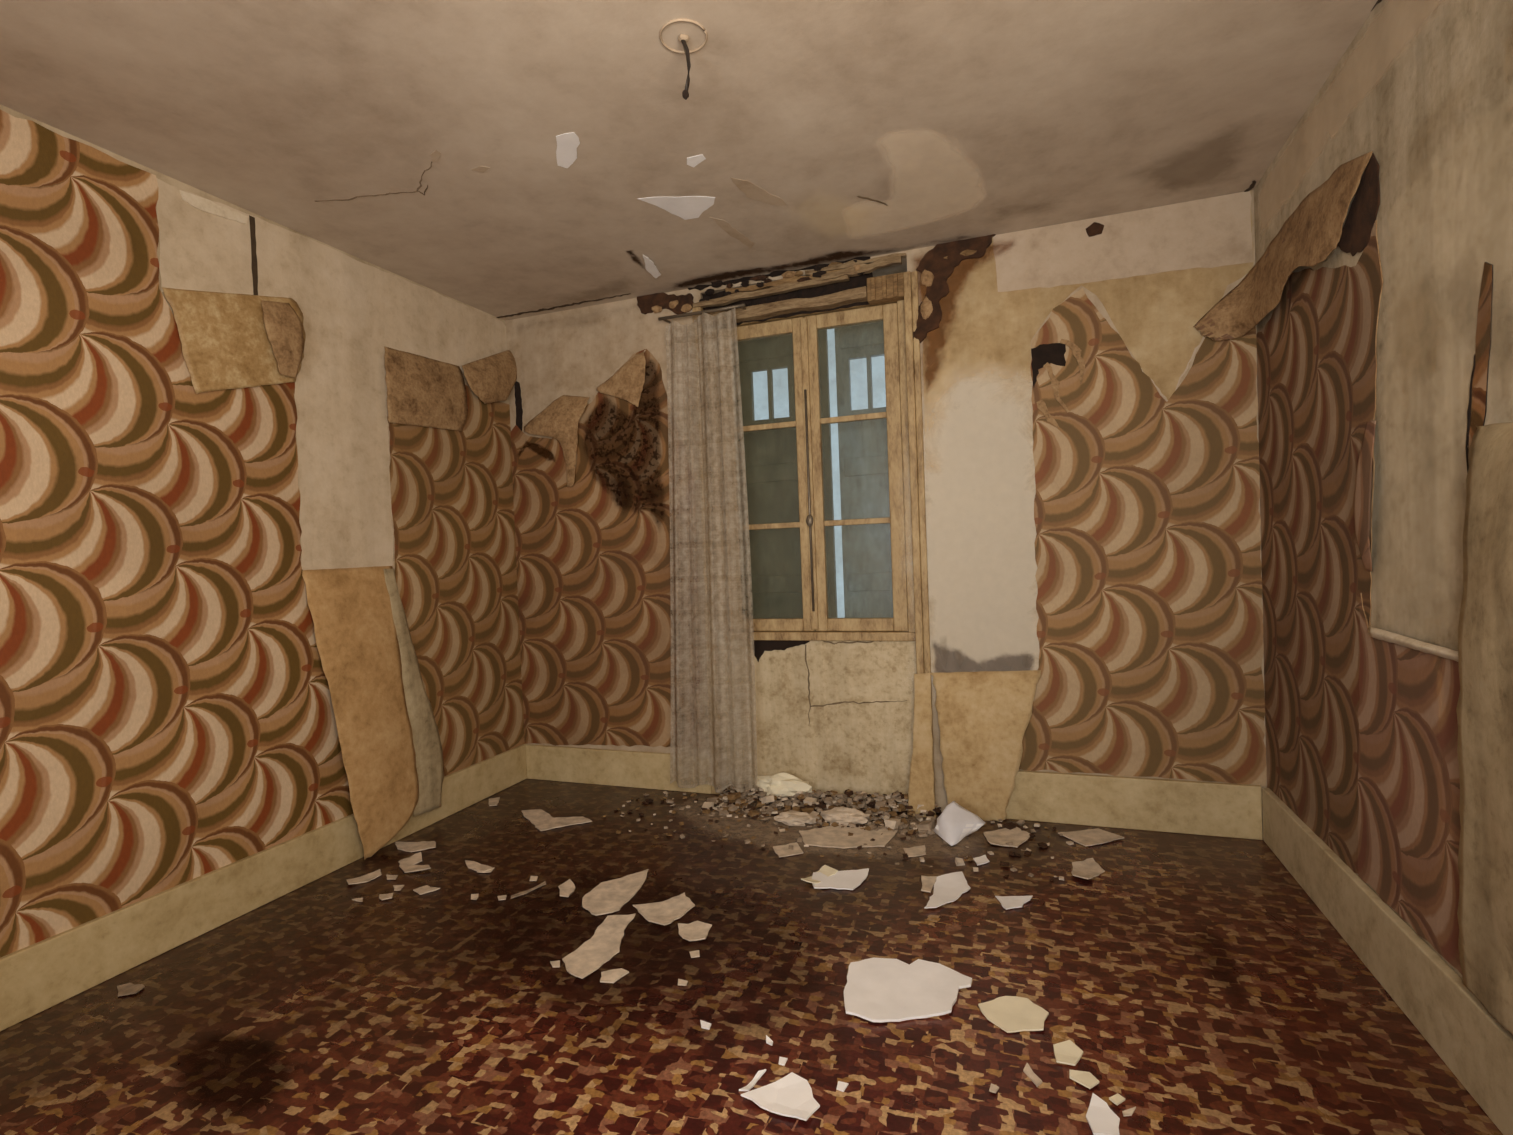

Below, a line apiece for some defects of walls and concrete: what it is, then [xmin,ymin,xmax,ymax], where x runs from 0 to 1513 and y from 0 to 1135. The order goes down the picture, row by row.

flaking render [156,178,699,900]
peeling [556,132,580,168]
damp [917,245,1006,384]
peeling [907,191,1253,910]